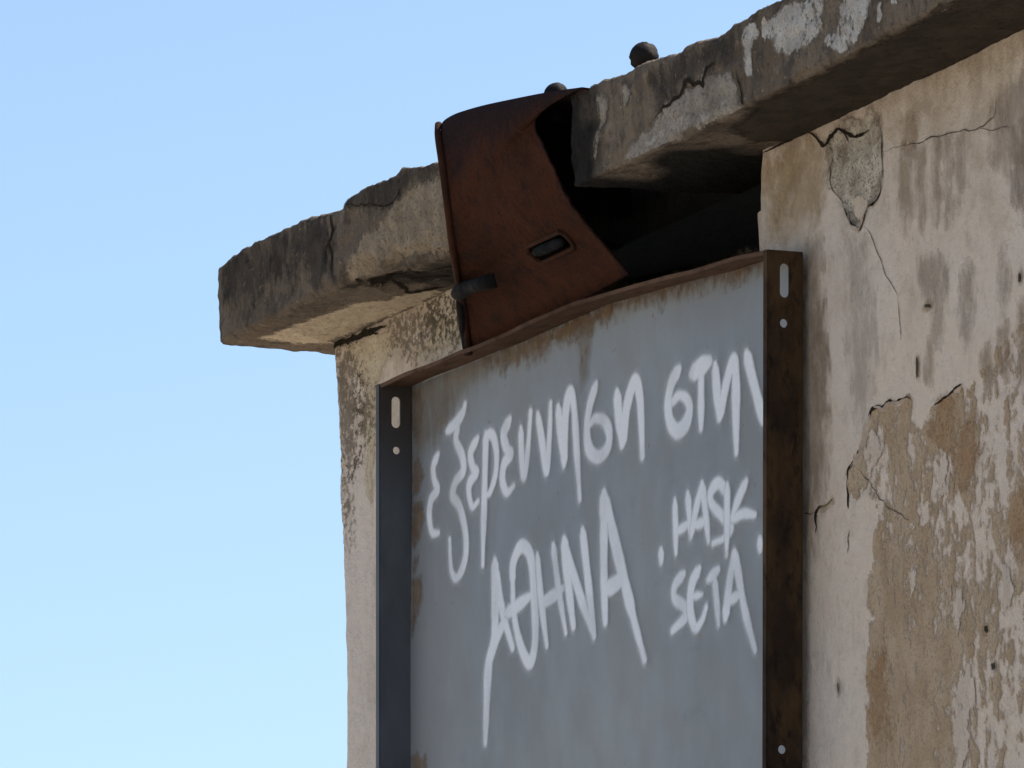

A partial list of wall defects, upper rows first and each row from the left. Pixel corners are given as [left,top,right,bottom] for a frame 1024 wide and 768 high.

flaking render [825,106,883,234]
crack [884,94,1009,152]
crack [323,214,455,294]
crack [865,227,901,337]
peeling [846,325,1024,768]